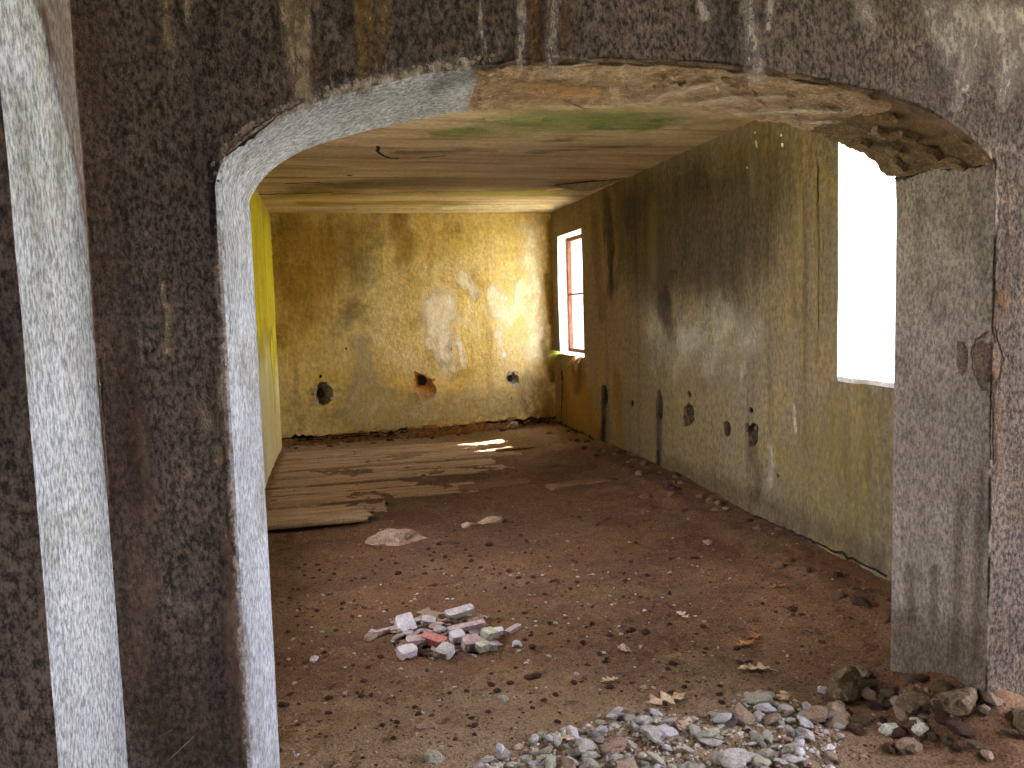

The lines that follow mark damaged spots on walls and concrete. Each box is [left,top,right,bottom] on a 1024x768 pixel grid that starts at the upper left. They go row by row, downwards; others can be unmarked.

spalling [210,54,991,183]
leakage [603,145,777,371]
spalling [415,373,436,401]
spalling [957,340,1001,386]
crack [730,503,887,577]